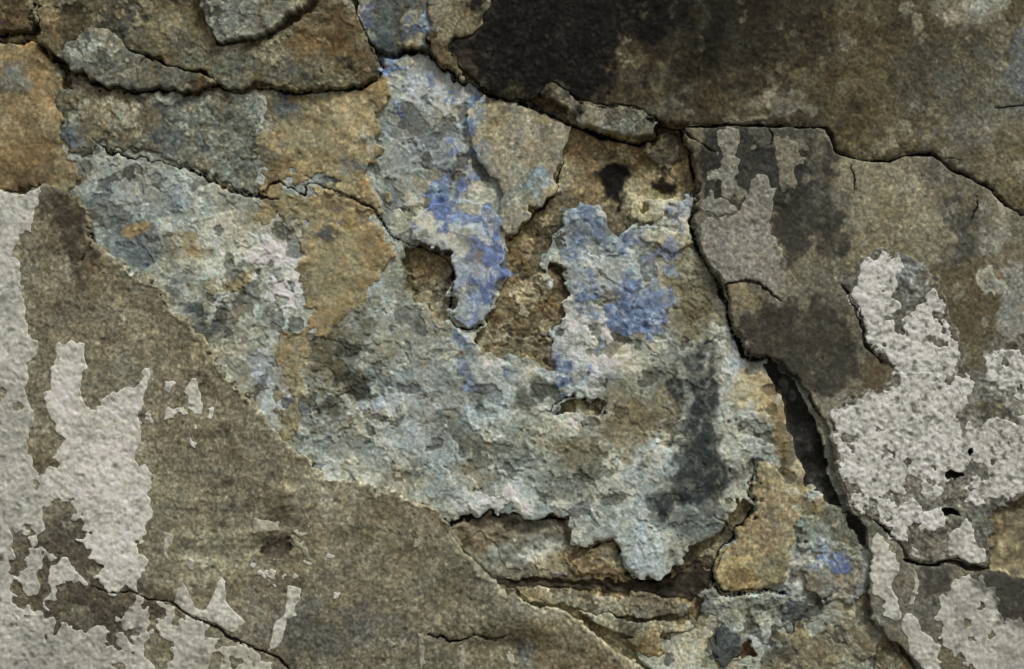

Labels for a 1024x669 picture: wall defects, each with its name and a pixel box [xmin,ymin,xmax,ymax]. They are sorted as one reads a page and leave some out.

crack [0,1,1024,364]
flaking render [62,53,1024,581]
peeling [0,188,312,669]
crack [98,588,289,669]
peeling [390,633,426,669]
crack [427,634,503,643]
crack [450,509,566,526]
crack [585,540,674,586]
flaking render [494,527,899,669]
crack [711,469,786,598]
peeling [852,533,1024,669]